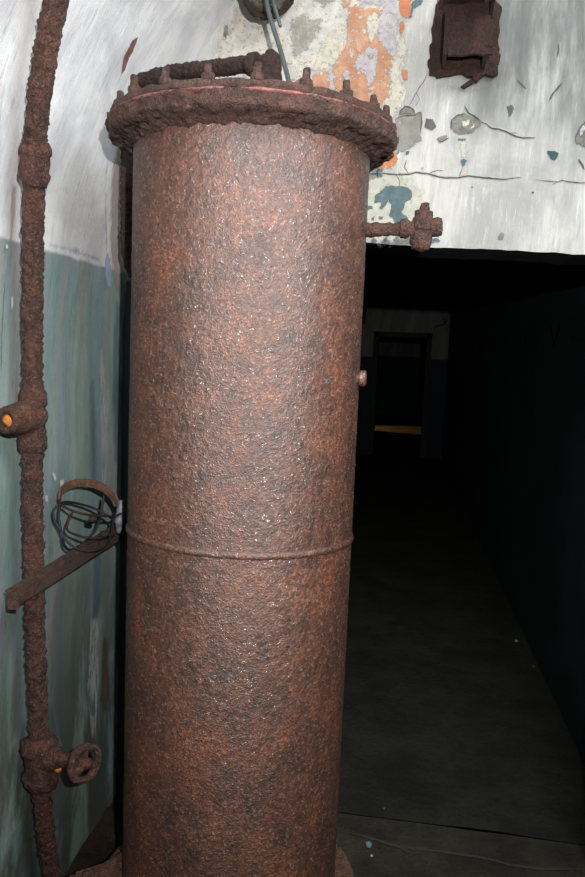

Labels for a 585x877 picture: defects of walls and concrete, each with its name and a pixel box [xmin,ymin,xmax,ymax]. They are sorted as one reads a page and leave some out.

peeling [203,0,481,223]
crack [465,107,535,138]
spalling [575,122,585,147]
crack [372,160,585,185]
peeling [366,235,410,243]